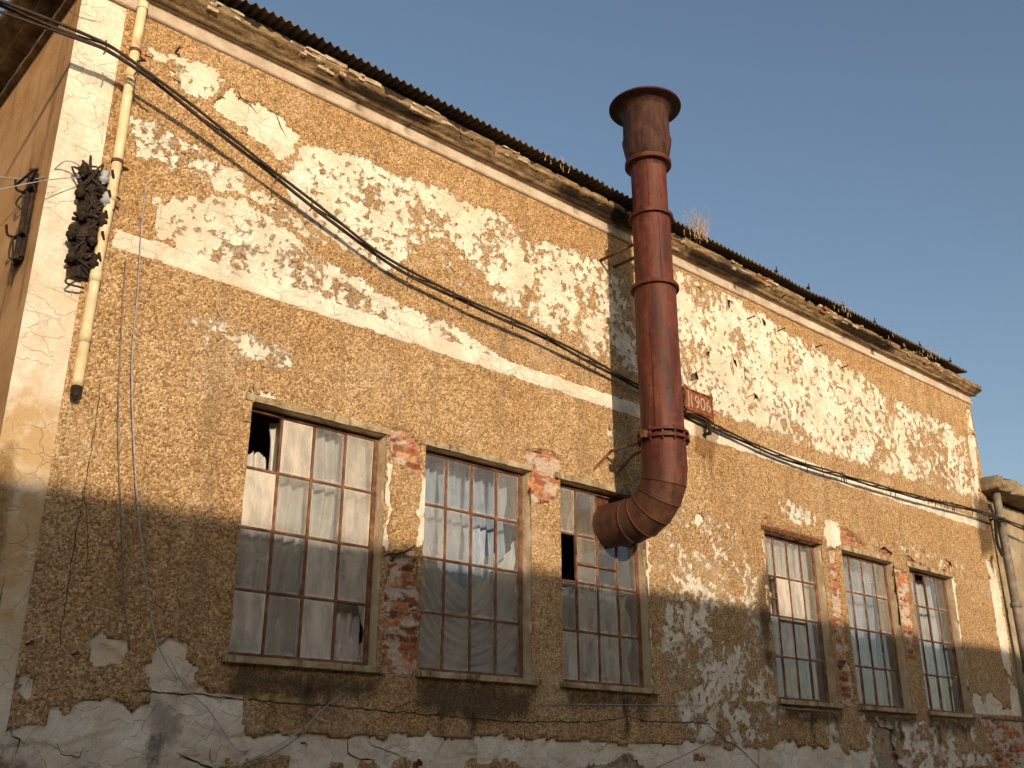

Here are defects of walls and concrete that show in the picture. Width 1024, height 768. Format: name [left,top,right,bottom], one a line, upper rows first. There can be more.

crack [58,376,102,654]
peeling [127,36,639,384]
peeling [4,311,1024,768]
spalling [730,260,779,288]
peeling [673,269,981,517]